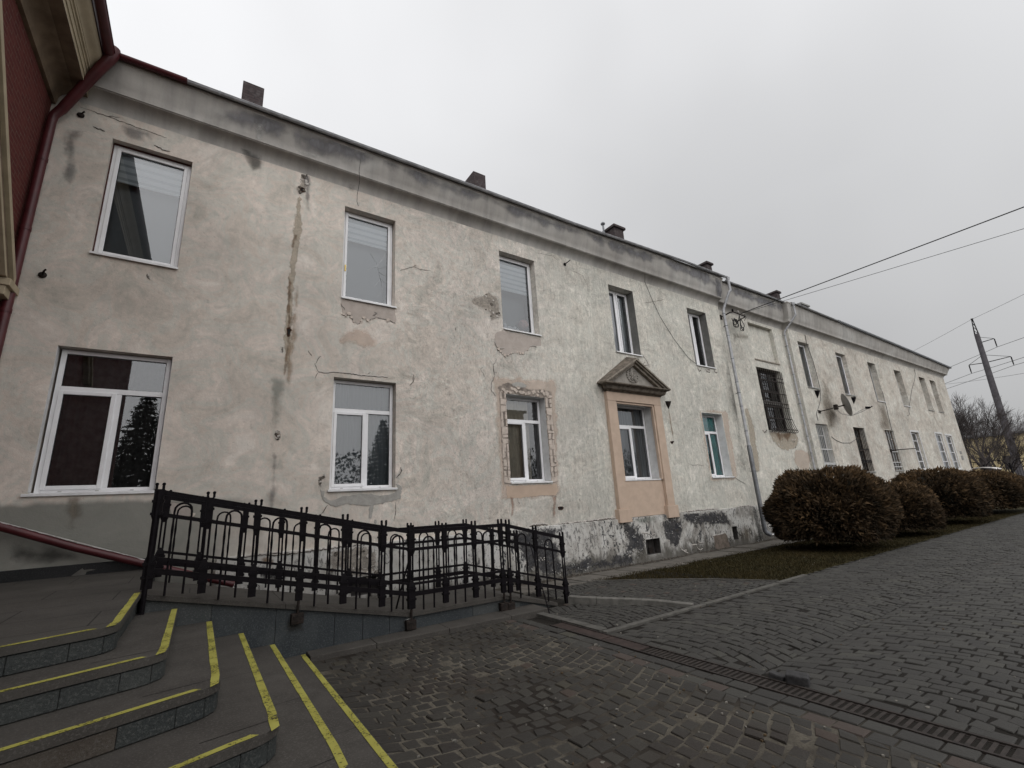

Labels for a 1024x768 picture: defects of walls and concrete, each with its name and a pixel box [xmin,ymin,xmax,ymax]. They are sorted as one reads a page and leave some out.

crack [81,107,170,152]
peeling [341,300,396,324]
peeling [472,292,541,357]
crack [280,347,414,385]
damp [661,510,730,548]